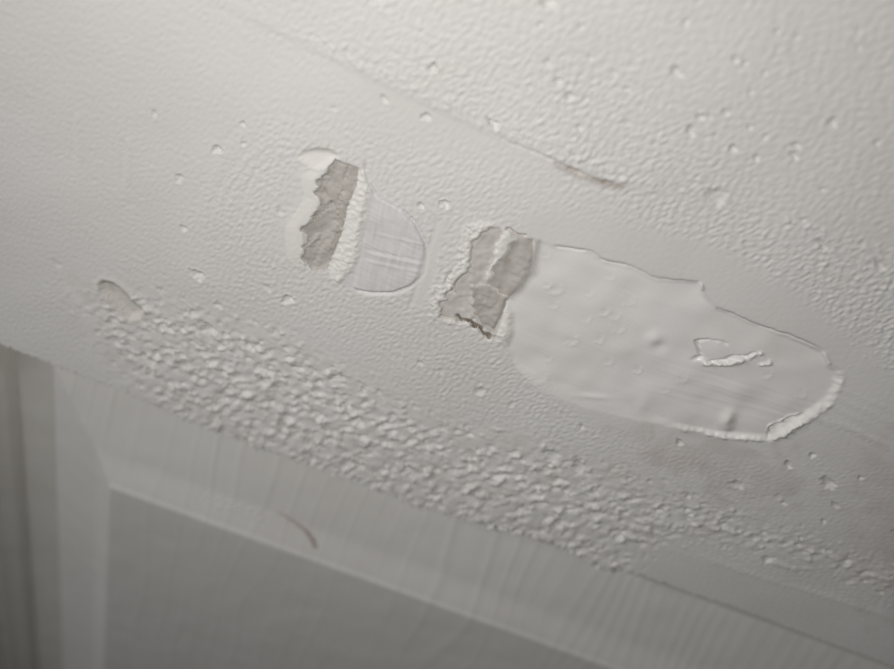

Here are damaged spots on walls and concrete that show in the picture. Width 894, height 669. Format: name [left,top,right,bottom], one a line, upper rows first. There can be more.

peeling [285,145,427,296]
peeling [432,224,843,448]